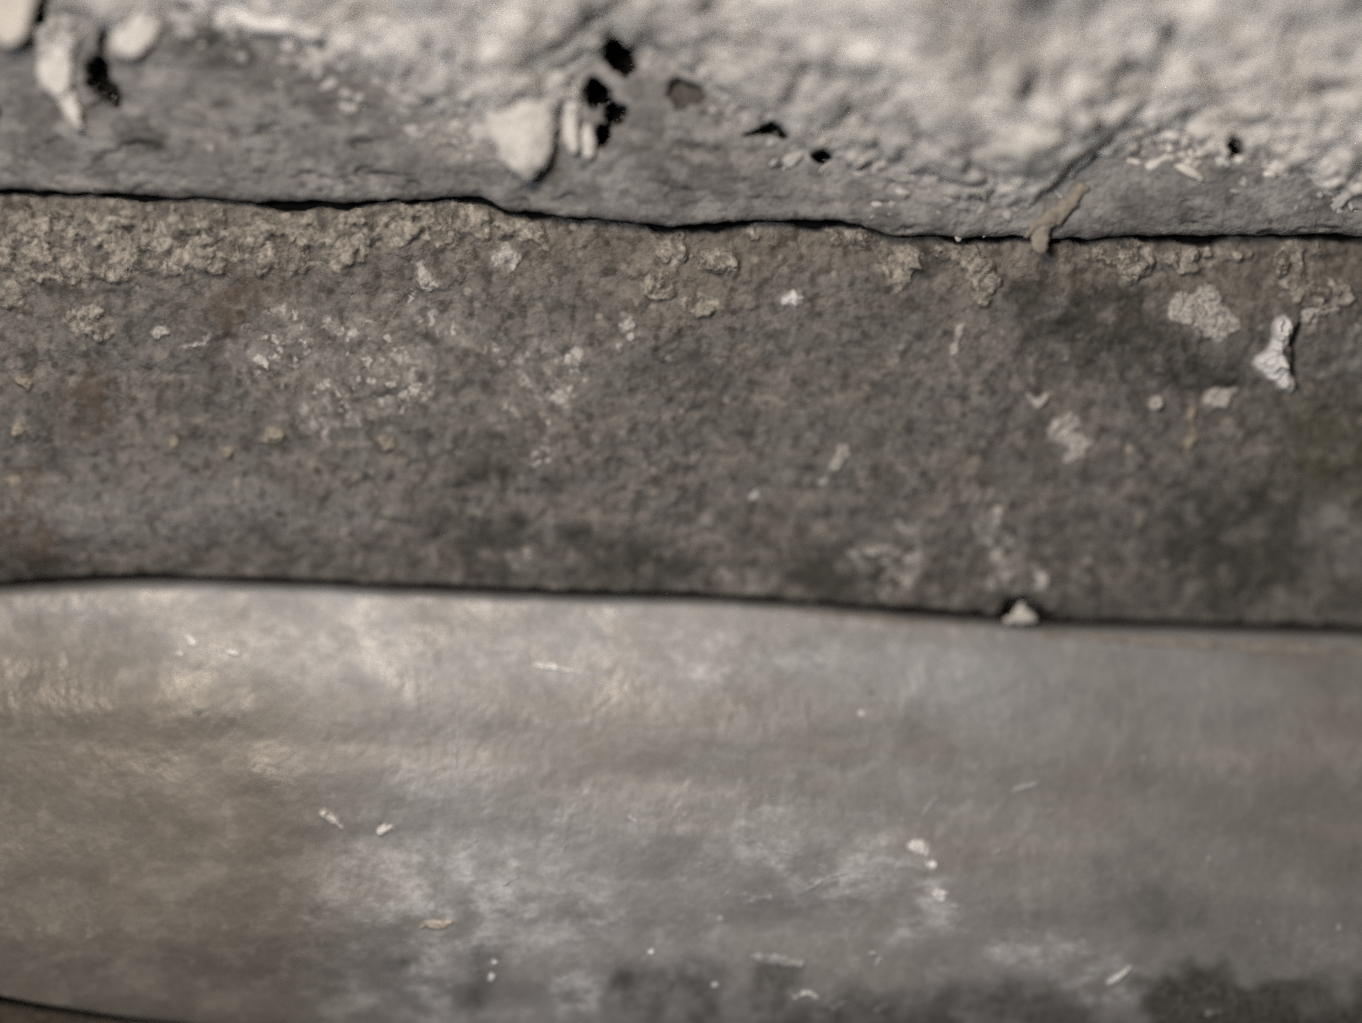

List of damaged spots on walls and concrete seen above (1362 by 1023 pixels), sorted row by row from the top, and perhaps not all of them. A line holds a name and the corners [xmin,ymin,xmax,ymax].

peeling [0,0,166,129]
peeling [472,35,637,181]
crack [0,188,191,202]
crack [258,196,591,221]
crack [643,219,884,234]
crack [937,235,1091,243]
peeling [1023,183,1090,253]
crack [1130,234,1228,245]
crack [1269,233,1359,242]
crack [0,572,1362,632]